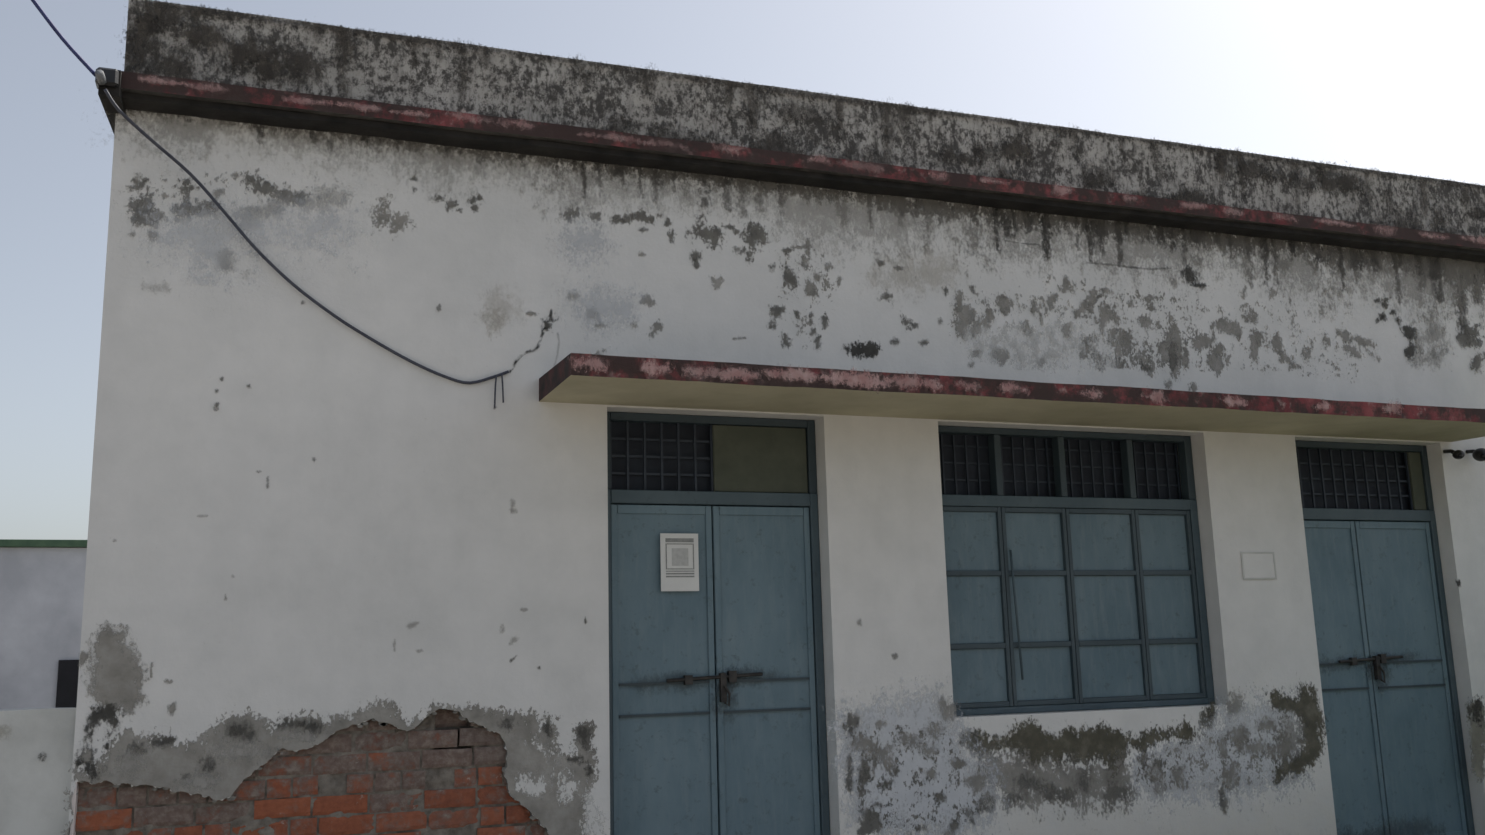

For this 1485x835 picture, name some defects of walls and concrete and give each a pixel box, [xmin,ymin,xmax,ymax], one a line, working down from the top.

peeling [285,97,427,116]
leakage [124,0,1485,234]
crack [509,310,558,372]
peeling [570,349,607,373]
peeling [563,206,841,349]
leakage [205,120,1485,332]
peeling [641,265,1420,405]
peeling [1456,324,1485,372]
peeling [62,621,606,835]
peeling [827,680,1009,835]
peeling [1129,683,1326,813]
peeling [1467,694,1485,782]